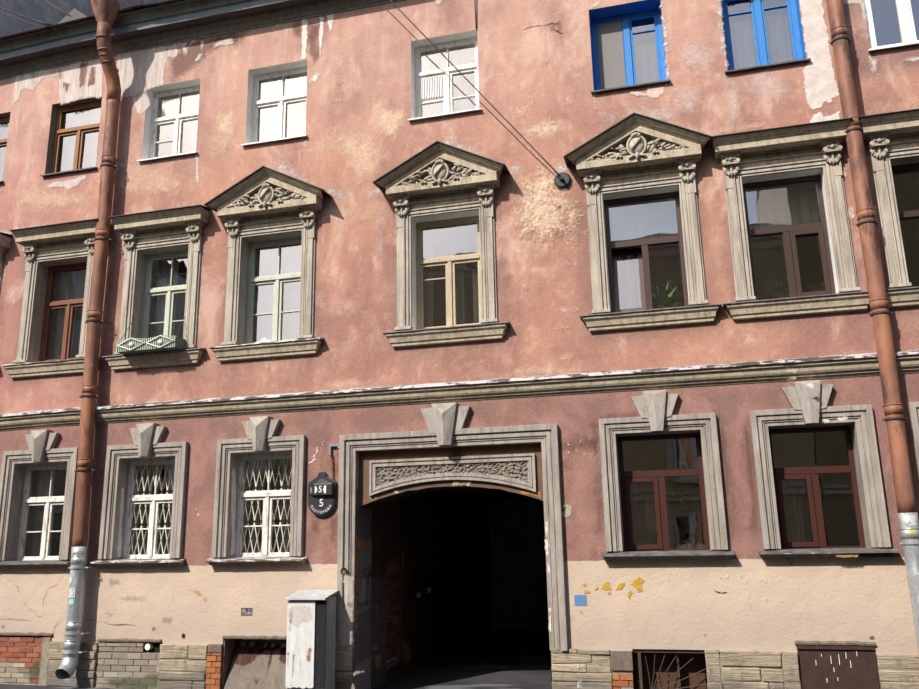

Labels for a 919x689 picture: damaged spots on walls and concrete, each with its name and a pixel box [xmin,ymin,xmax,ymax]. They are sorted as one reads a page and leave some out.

flaking render [121,0,142,8]
water stain [301,14,340,59]
peeling [13,60,103,105]
peeling [117,38,233,115]
flaking render [799,0,840,123]
peeling [20,175,87,213]
flaking render [341,533,372,633]